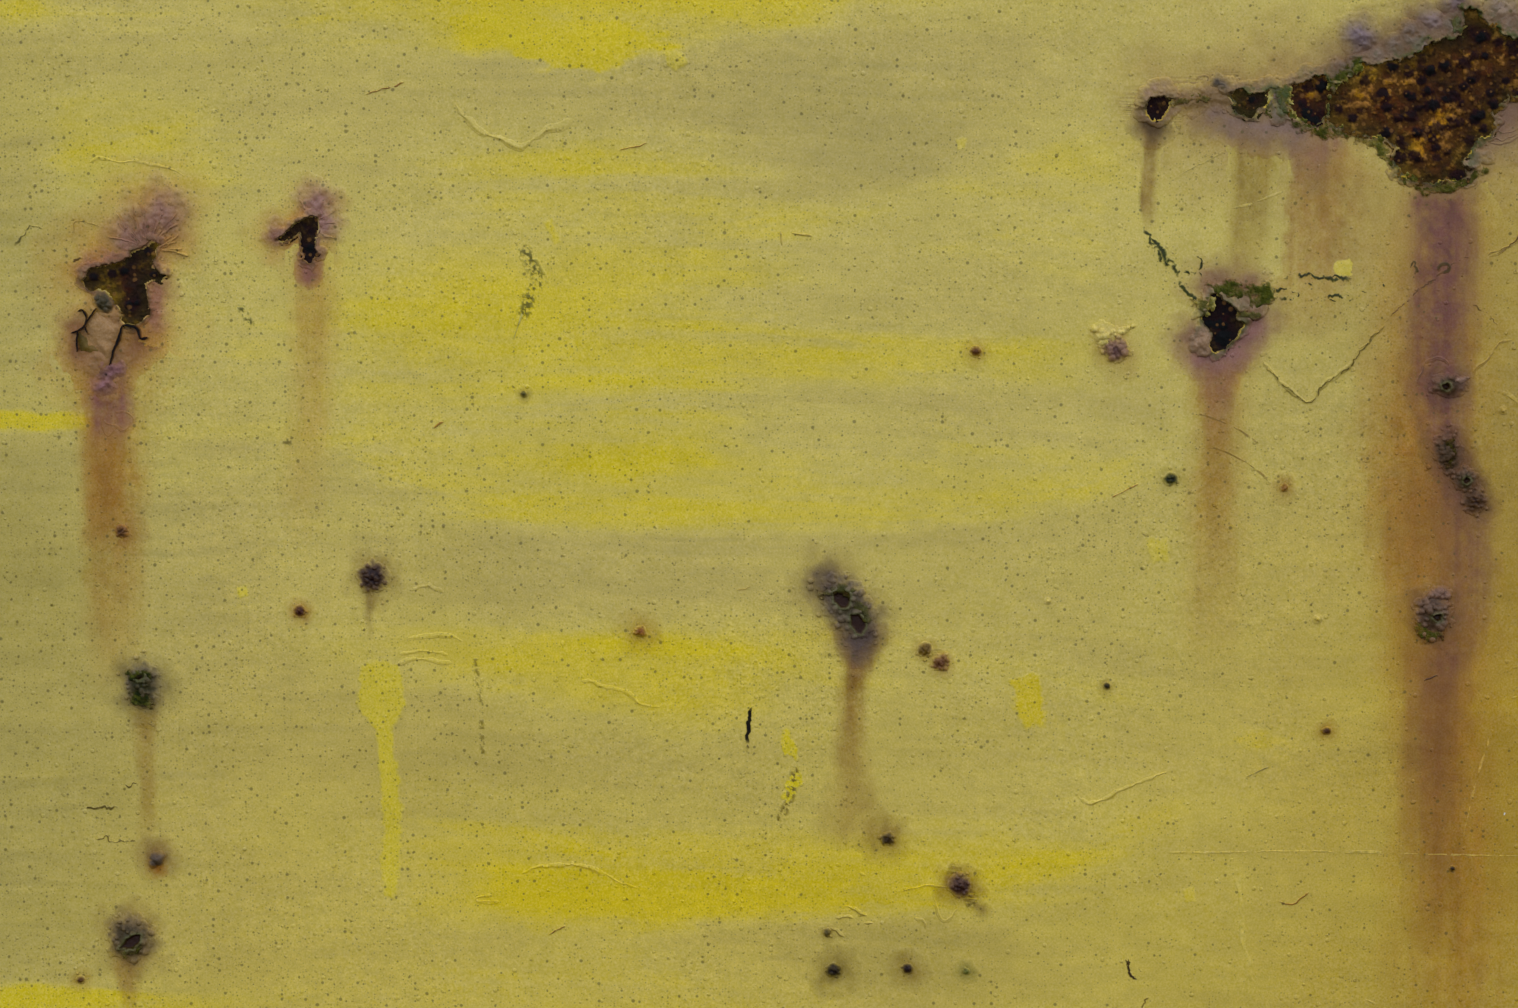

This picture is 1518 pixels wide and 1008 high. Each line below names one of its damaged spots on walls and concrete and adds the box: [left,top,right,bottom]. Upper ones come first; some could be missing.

peeling [1090,0,1518,226]
rust [273,244,347,545]
crack [1263,235,1518,403]
rust [49,347,186,1008]
rust [782,537,959,869]
rust [1153,134,1518,1008]
rust [931,857,995,923]